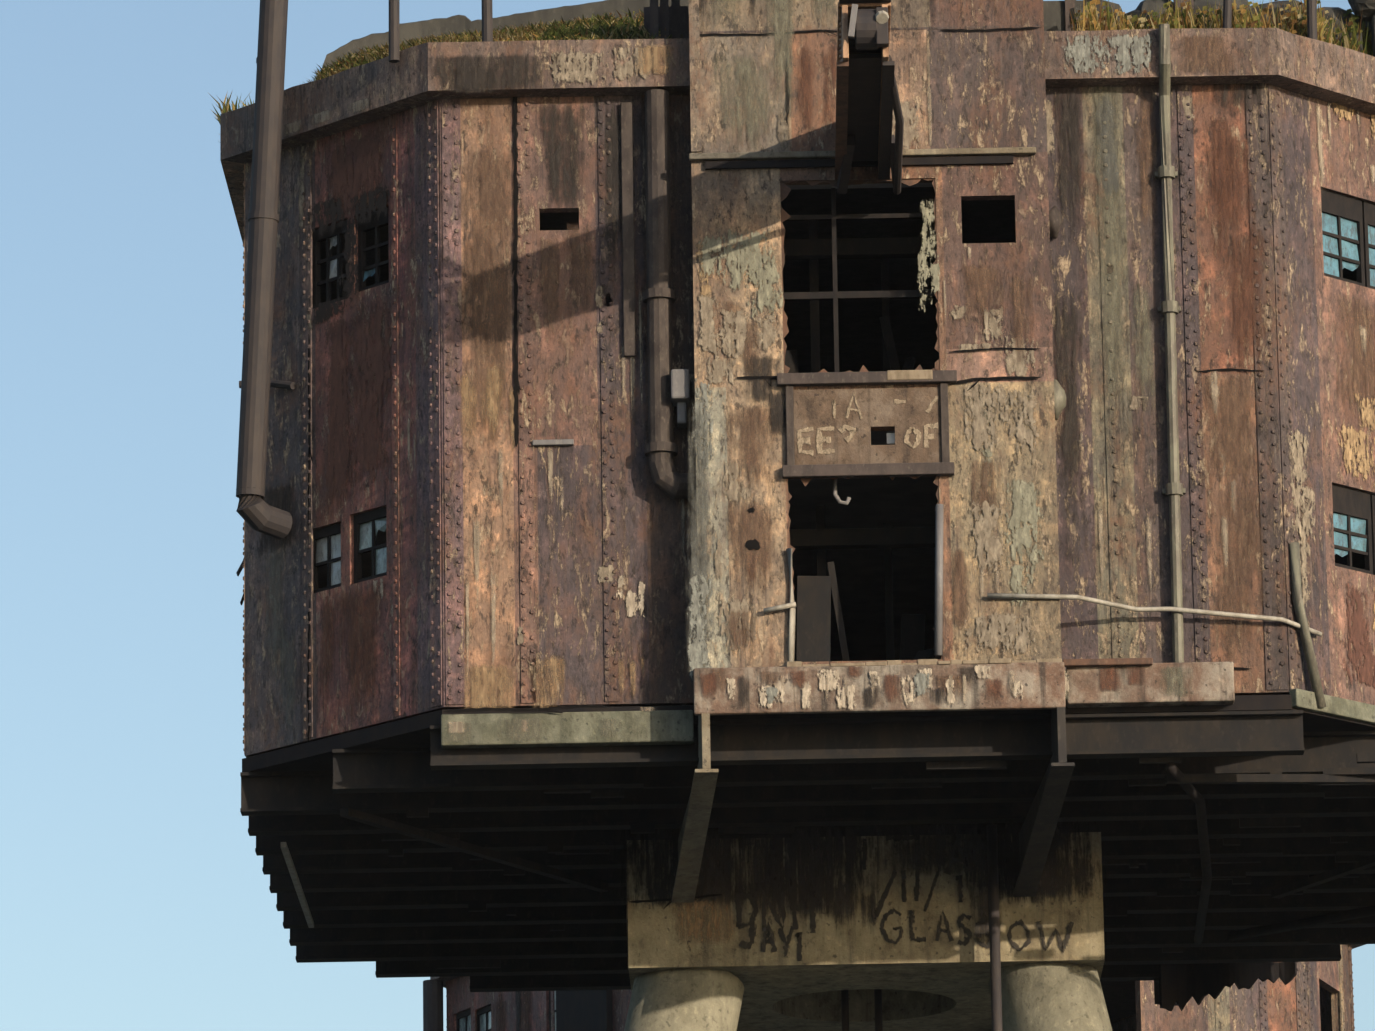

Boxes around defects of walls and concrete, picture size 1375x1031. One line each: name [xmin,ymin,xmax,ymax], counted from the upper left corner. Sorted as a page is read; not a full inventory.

peeling [594,565,645,617]
peeling [726,678,736,700]
damp [621,822,1093,943]